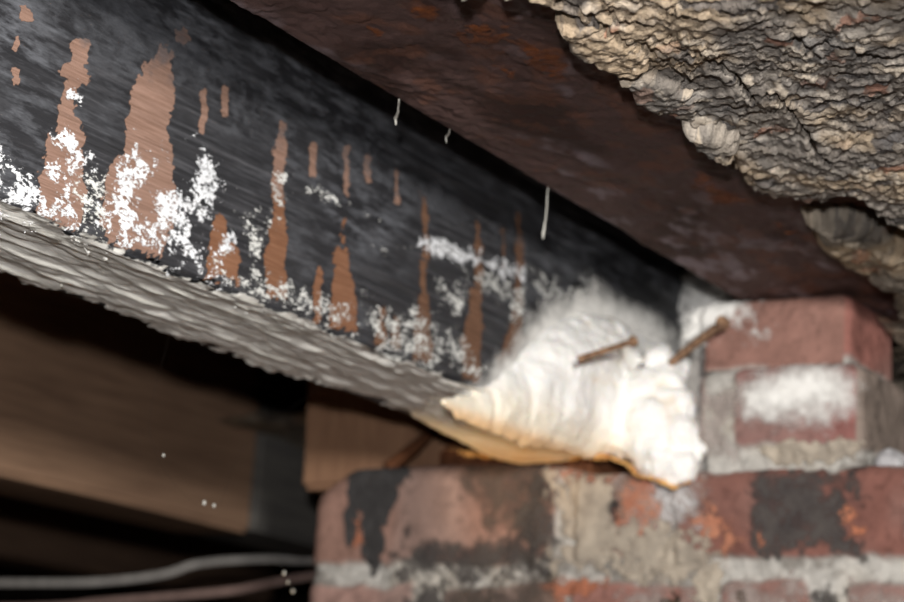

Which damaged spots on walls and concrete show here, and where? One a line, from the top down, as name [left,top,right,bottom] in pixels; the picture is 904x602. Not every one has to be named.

damp [66,88,83,103]
damp [0,125,618,412]
damp [343,484,399,577]